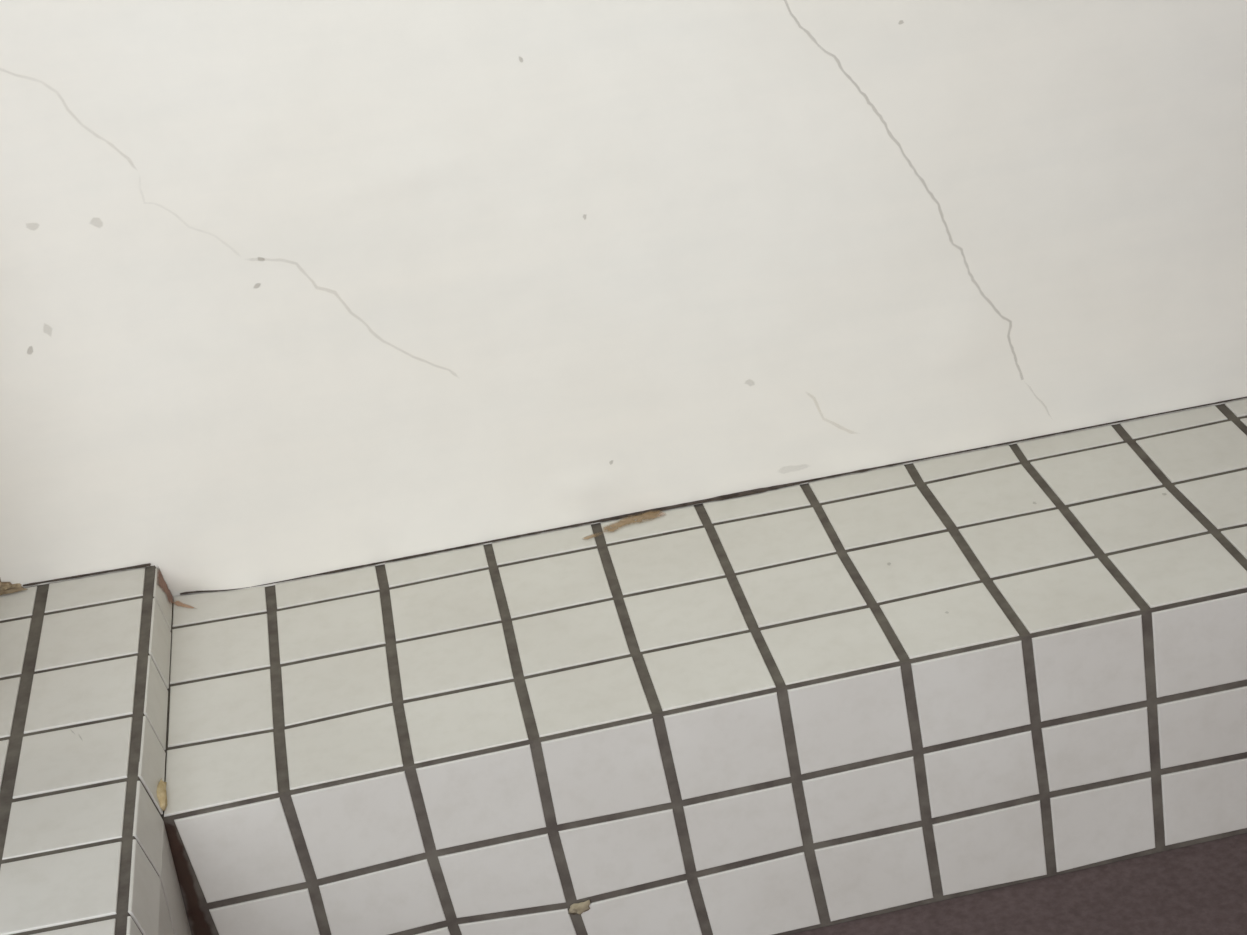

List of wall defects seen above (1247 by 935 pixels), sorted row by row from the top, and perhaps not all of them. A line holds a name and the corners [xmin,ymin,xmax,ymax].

flaking render [0,579,28,595]